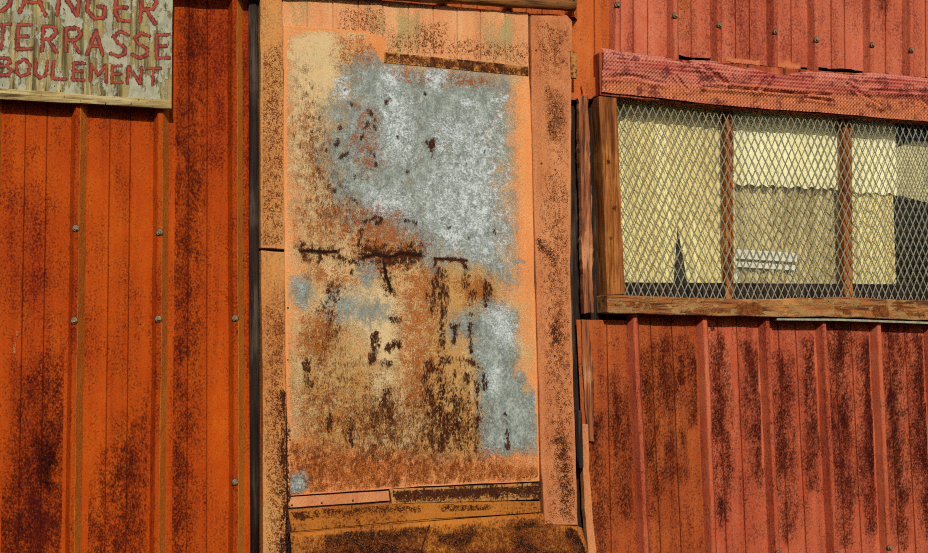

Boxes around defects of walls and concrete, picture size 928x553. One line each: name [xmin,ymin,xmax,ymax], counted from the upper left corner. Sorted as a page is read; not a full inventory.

rust [341,8,568,76]
peeling [287,0,538,457]
rust [263,42,576,553]
rust [589,378,632,553]
rust [640,336,698,511]
rust [708,323,764,526]
rust [772,334,820,543]
rust [826,318,877,544]
rust [882,323,928,550]